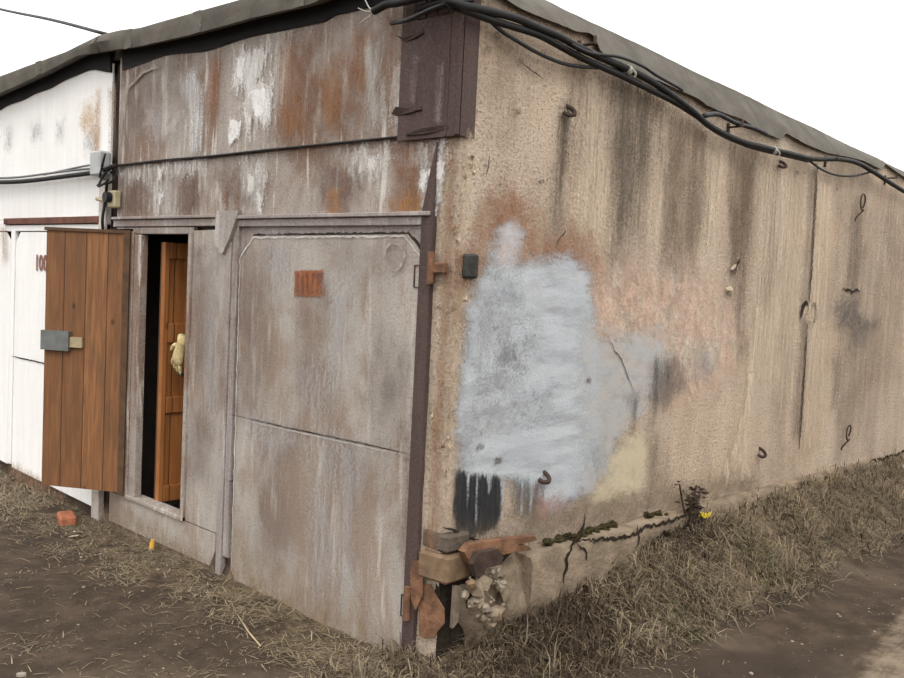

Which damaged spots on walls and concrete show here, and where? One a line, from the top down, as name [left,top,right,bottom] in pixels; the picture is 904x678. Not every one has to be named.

corrosion [276,30,382,145]
spalling [458,553,527,644]